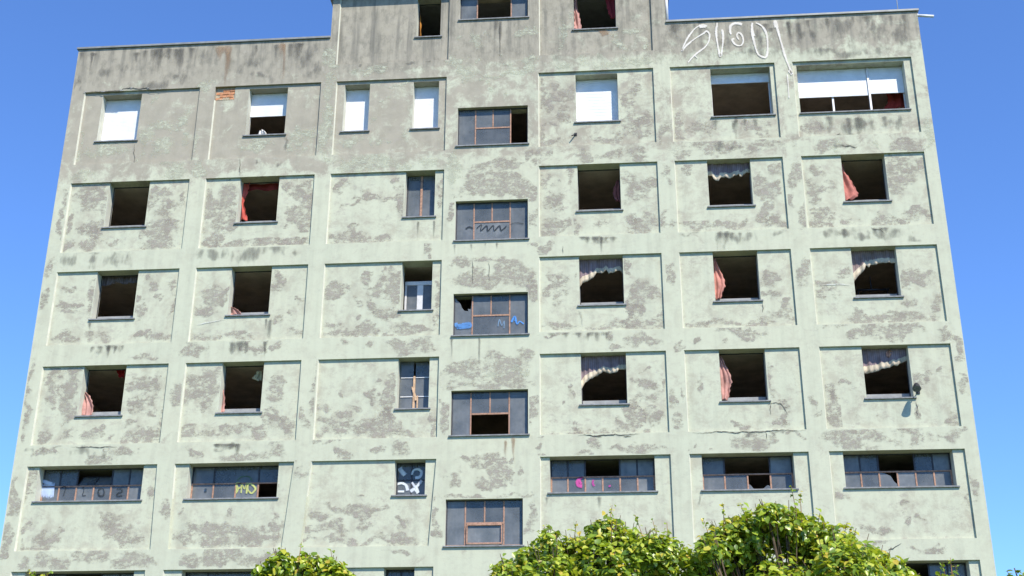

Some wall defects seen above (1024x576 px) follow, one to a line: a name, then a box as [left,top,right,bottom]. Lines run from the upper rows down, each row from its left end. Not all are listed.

spalling [198,82,235,101]
peeling [289,81,579,255]
peeling [577,84,780,200]
peeling [202,179,313,248]
peeling [328,266,435,356]
peeling [453,256,577,305]
peeling [847,296,940,341]
peeling [172,367,219,409]
peeling [208,373,414,459]
crack [693,402,797,438]
peeling [811,379,890,450]
peeling [449,453,538,534]